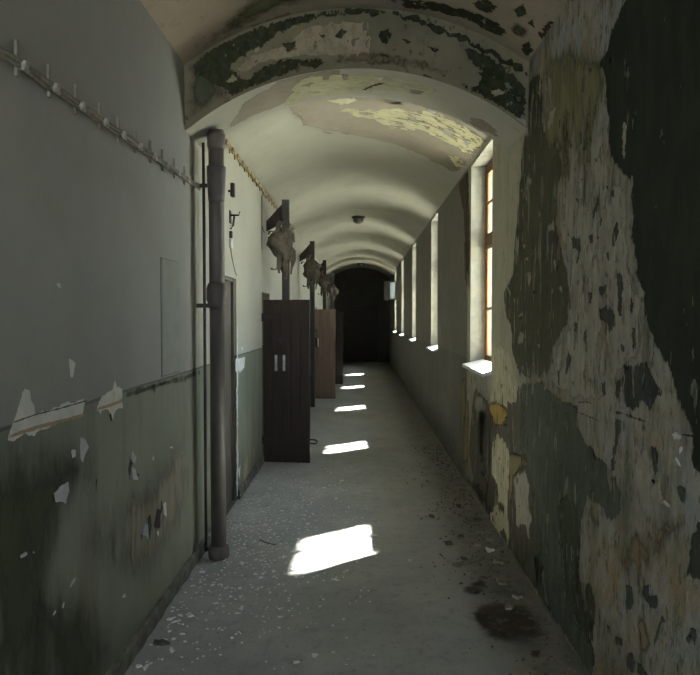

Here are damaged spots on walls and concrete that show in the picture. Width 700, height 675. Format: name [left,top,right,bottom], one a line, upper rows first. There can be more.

peeling [237,21,371,72]
peeling [285,74,499,168]
peeling [472,63,639,546]
peeling [8,389,87,441]
peeling [97,381,124,421]
damp [126,372,195,396]
peeling [71,437,89,462]
peeling [52,482,69,504]
damp [113,445,183,572]
flaking render [141,500,167,539]
damp [0,460,101,675]
flaking render [684,522,700,580]